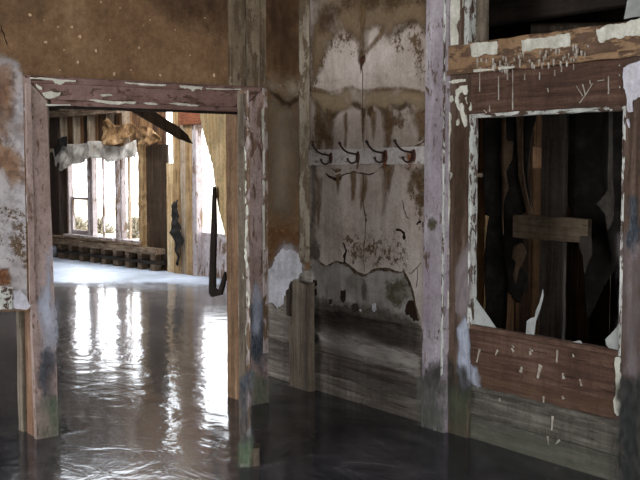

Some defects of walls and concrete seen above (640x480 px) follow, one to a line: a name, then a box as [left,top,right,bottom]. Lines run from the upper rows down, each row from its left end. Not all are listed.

peeling [470,41,498,58]
peeling [521,33,571,52]
peeling [596,18,640,43]
water stain [310,0,426,150]
peeling [623,61,640,128]
peeling [0,59,76,297]
water stain [350,171,367,207]
water stain [383,164,394,196]
water stain [310,241,320,260]
crack [339,244,347,264]
peeling [268,242,303,308]
spalling [311,258,421,326]